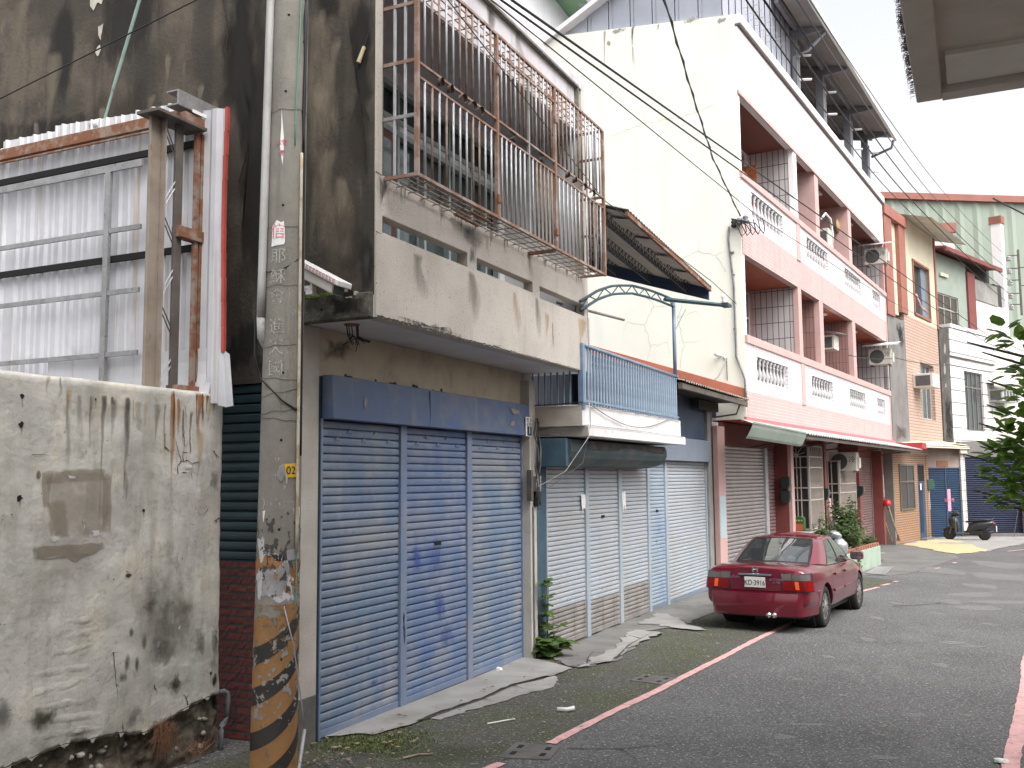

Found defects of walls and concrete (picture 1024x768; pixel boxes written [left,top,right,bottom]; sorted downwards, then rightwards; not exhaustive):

corrosion [171,392,180,441]
crack [164,416,217,474]
corrosion [196,394,215,422]
peeling [255,468,301,603]
flaking render [2,694,215,768]